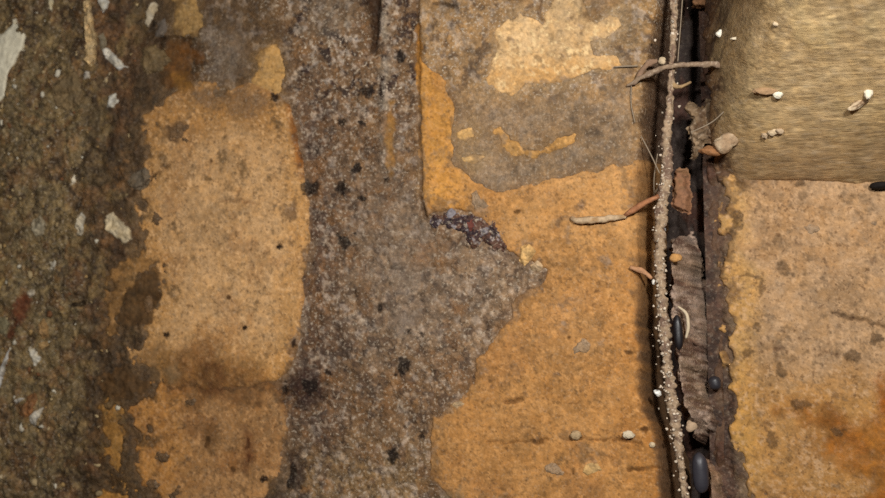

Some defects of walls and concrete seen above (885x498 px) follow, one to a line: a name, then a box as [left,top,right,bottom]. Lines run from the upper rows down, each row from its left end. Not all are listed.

damp [301,181,319,195]
damp [337,232,357,250]
spalling [97,44,310,498]
spalling [415,58,698,498]
damp [395,357,411,376]
damp [388,448,398,465]